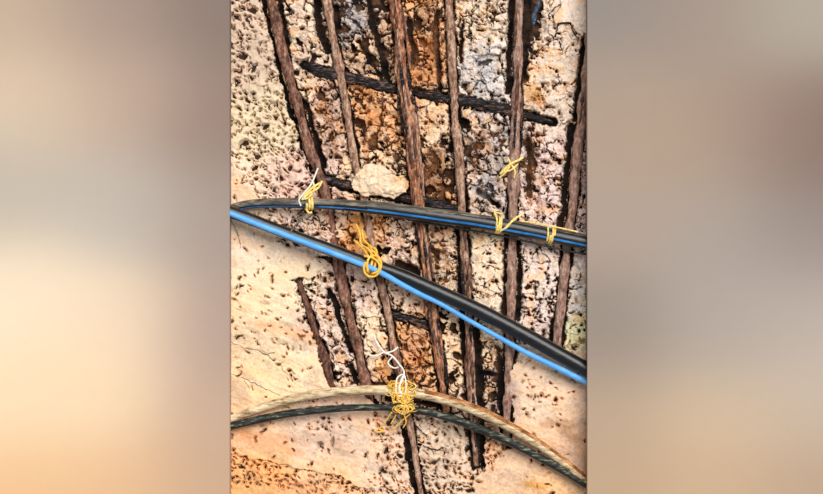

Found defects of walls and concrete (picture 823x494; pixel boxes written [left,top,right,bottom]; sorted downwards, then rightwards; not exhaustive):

spalling [231,0,586,354]
spalling [231,235,542,494]